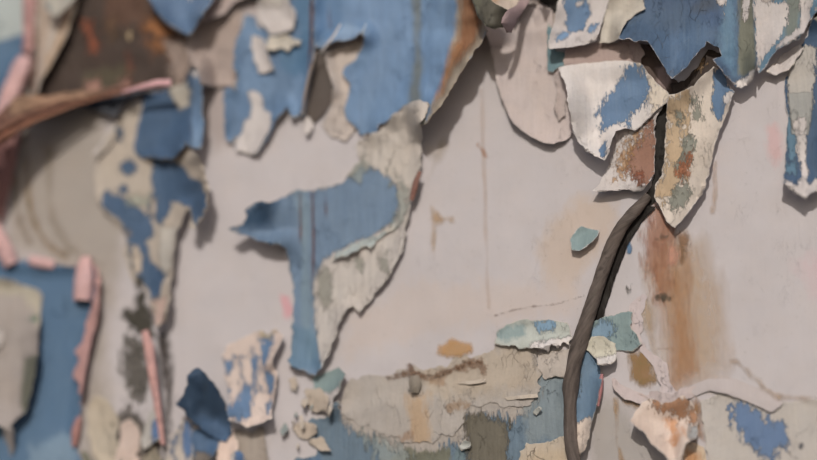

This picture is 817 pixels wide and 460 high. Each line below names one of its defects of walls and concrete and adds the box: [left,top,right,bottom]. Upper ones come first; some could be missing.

corrosion [438,0,480,96]
peeling [484,0,817,228]
peeling [0,0,572,460]
peeling [570,226,599,251]
corrosion [630,352,656,385]
corrosion [647,207,713,376]
peeling [577,294,817,460]